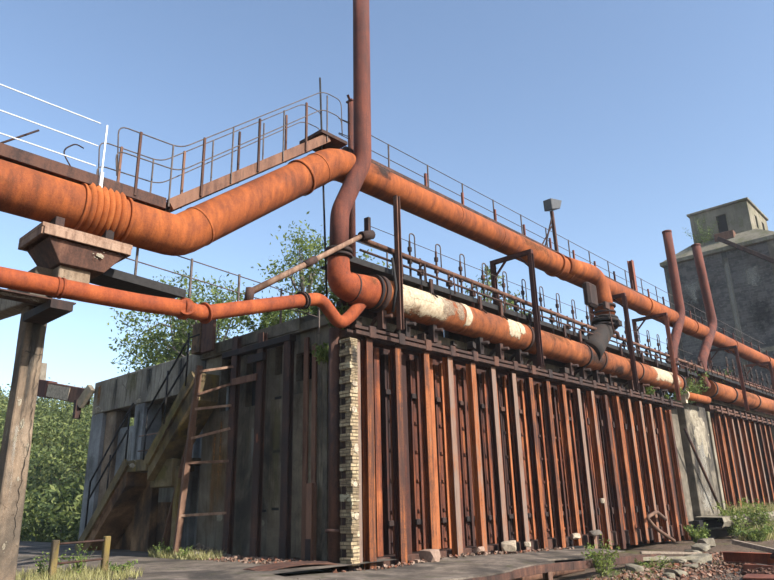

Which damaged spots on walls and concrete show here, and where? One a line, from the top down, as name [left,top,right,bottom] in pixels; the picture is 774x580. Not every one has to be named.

peeling [403,284,473,326]
peeling [507,319,526,339]